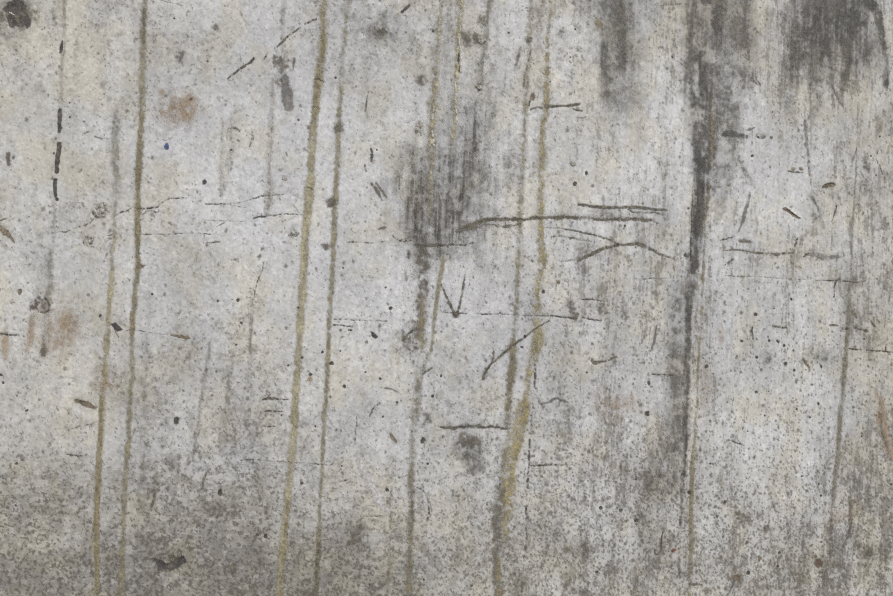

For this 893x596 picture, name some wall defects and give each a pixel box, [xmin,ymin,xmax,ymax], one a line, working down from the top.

damp [601,0,633,98]
damp [785,0,887,97]
damp [402,119,479,351]
damp [671,0,749,596]